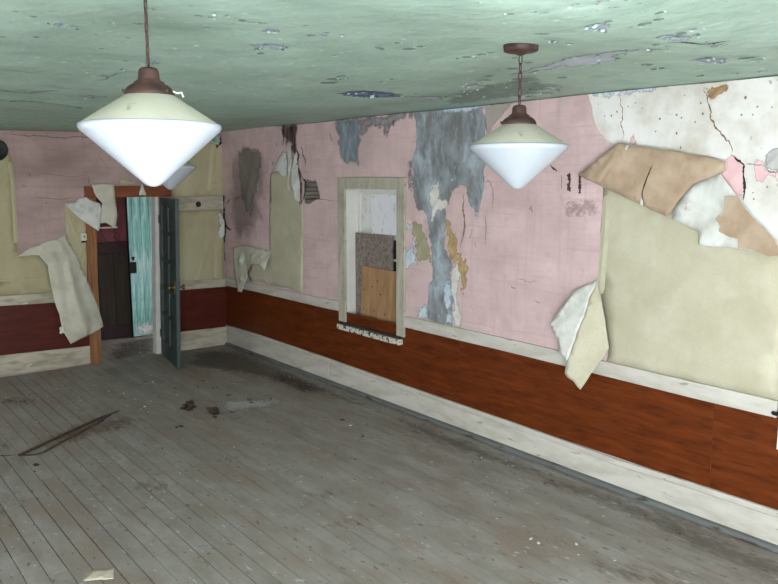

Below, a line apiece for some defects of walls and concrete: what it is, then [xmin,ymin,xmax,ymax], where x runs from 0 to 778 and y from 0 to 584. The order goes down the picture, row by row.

peeling [66,184,117,231]
damp [227,148,262,212]
peeling [338,79,403,99]
crack [283,75,778,200]
peeling [406,28,705,325]
flaking render [578,70,778,256]
peeling [17,235,103,344]
peeling [233,245,271,292]
peeling [550,280,609,390]